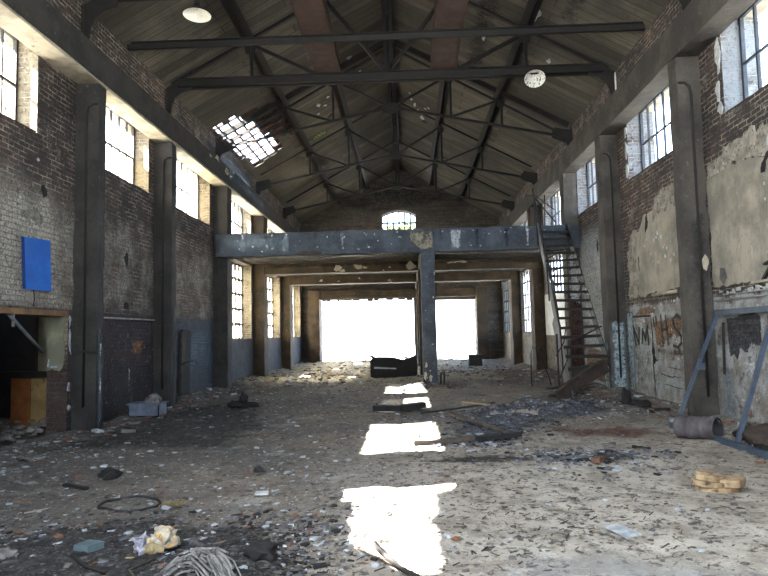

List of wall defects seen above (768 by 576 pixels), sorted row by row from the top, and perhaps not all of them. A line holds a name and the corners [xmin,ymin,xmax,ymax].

flaking render [714,37,724,114]
flaking render [707,122,768,184]
flaking render [627,183,678,300]
flaking render [719,268,768,296]